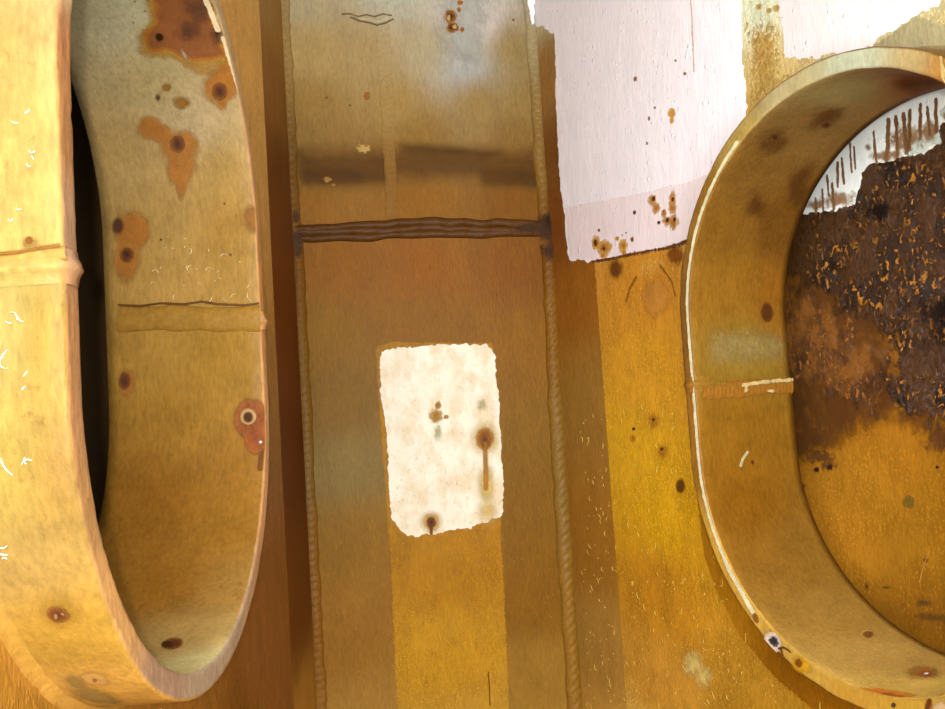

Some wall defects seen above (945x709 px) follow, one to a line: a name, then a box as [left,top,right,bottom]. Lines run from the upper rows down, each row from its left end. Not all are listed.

corrosion [134,0,236,109]
corrosion [138,117,198,196]
corrosion [592,229,687,263]
corrosion [648,192,679,230]
corrosion [786,274,945,472]
corrosion [234,399,265,471]
corrosion [476,426,495,516]